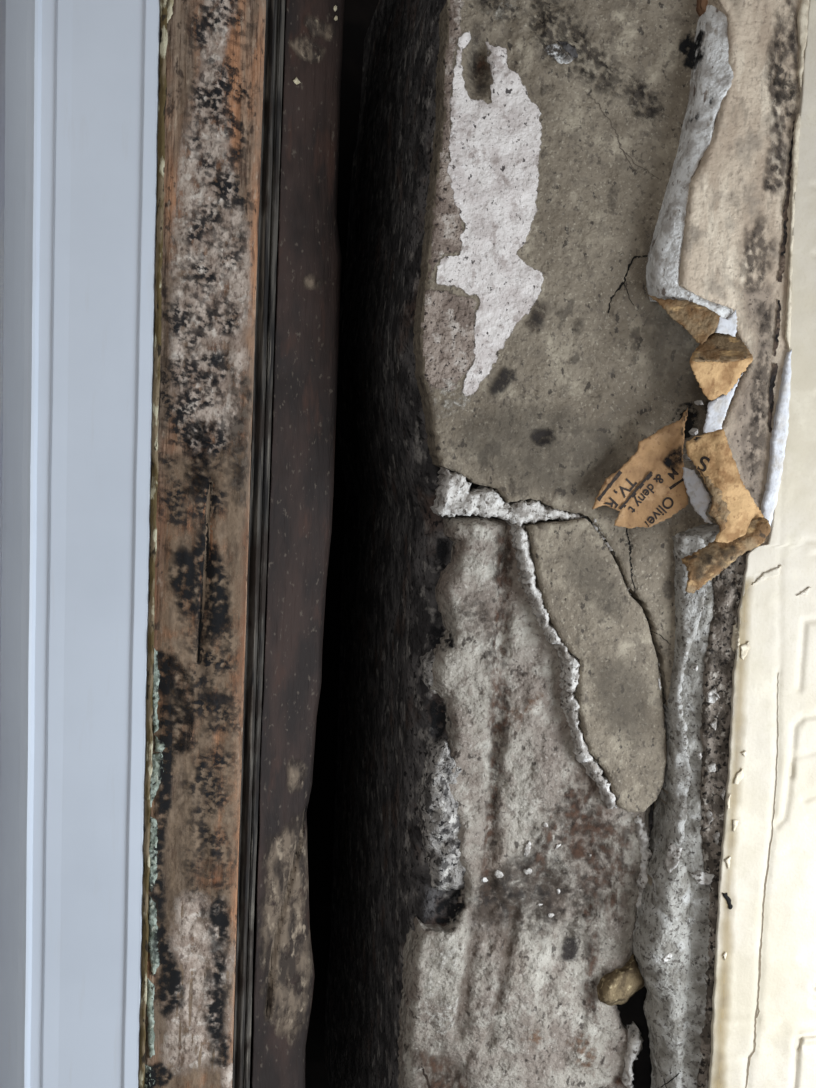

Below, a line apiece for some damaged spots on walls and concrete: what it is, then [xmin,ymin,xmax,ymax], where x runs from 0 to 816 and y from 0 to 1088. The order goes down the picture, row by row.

mould [190,0,252,48]
leakage [480,0,664,119]
mould [764,0,797,193]
peeling [421,0,544,408]
mould [745,222,776,291]
mould [747,304,771,475]
mould [151,54,252,1066]
crack [527,513,636,595]
crack [646,617,669,741]
crack [745,673,779,1088]
mould [144,1063,173,1088]
crack [617,986,652,1088]